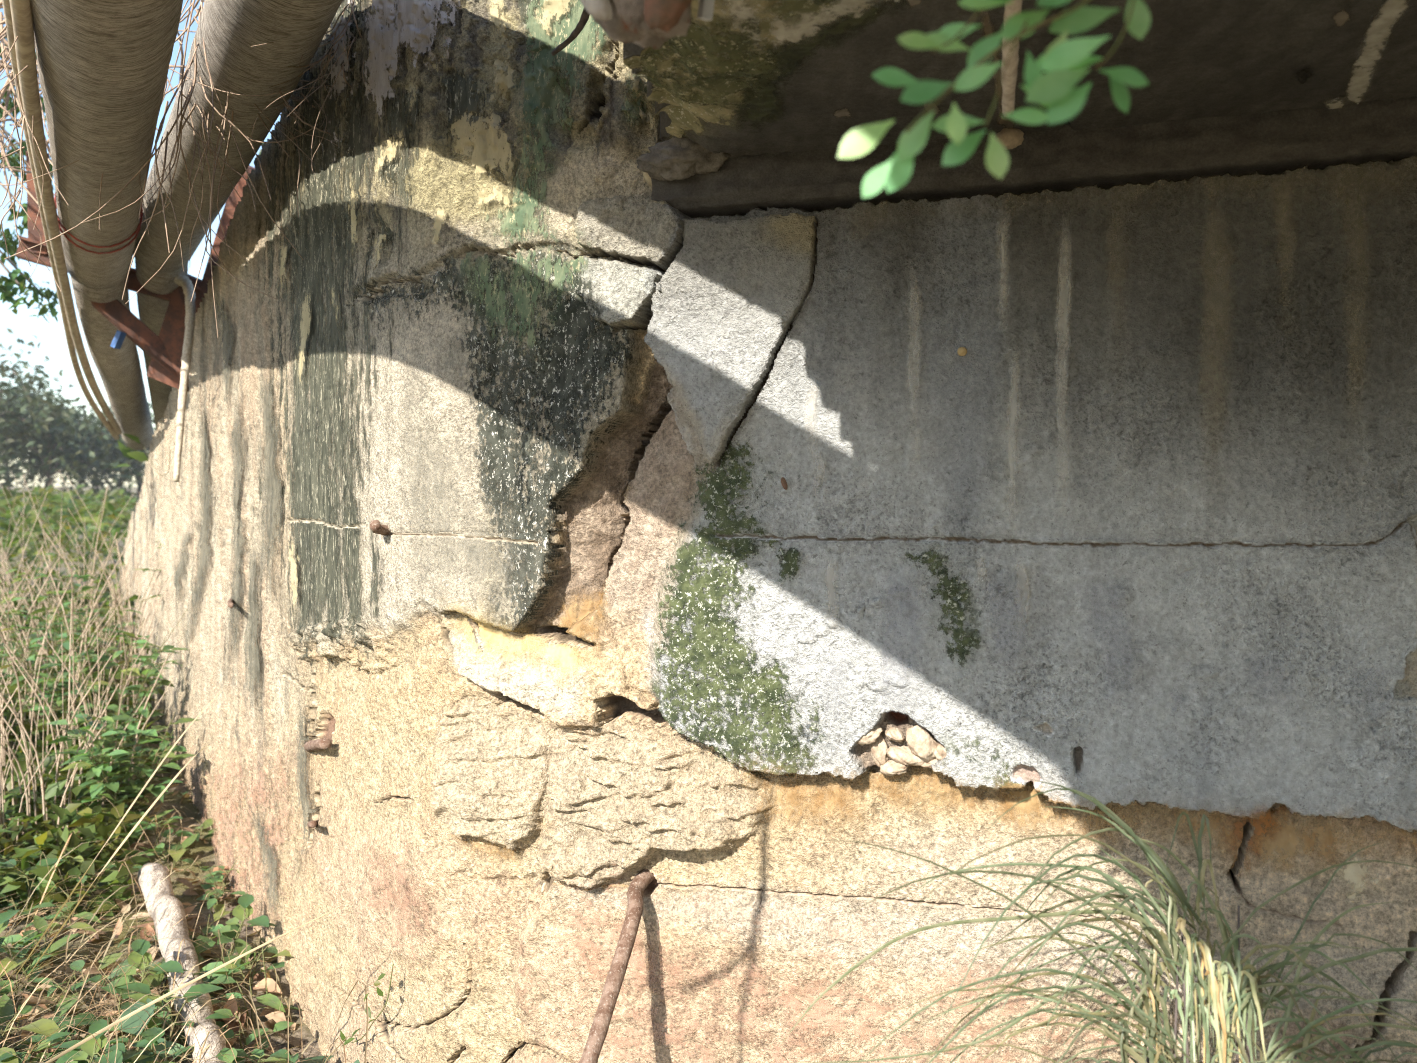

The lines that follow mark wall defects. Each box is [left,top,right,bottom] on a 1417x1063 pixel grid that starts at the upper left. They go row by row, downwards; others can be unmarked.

peeling [327,0,461,172]
peeling [451,0,517,207]
leakage [621,0,908,138]
leakage [173,413,213,639]
leakage [217,0,635,707]
peeling [440,67,817,740]
crack [608,393,672,576]
crack [715,218,820,468]
crack [715,515,1417,550]
leakage [752,661,824,751]
spalling [850,711,947,776]
crack [332,943,473,1063]